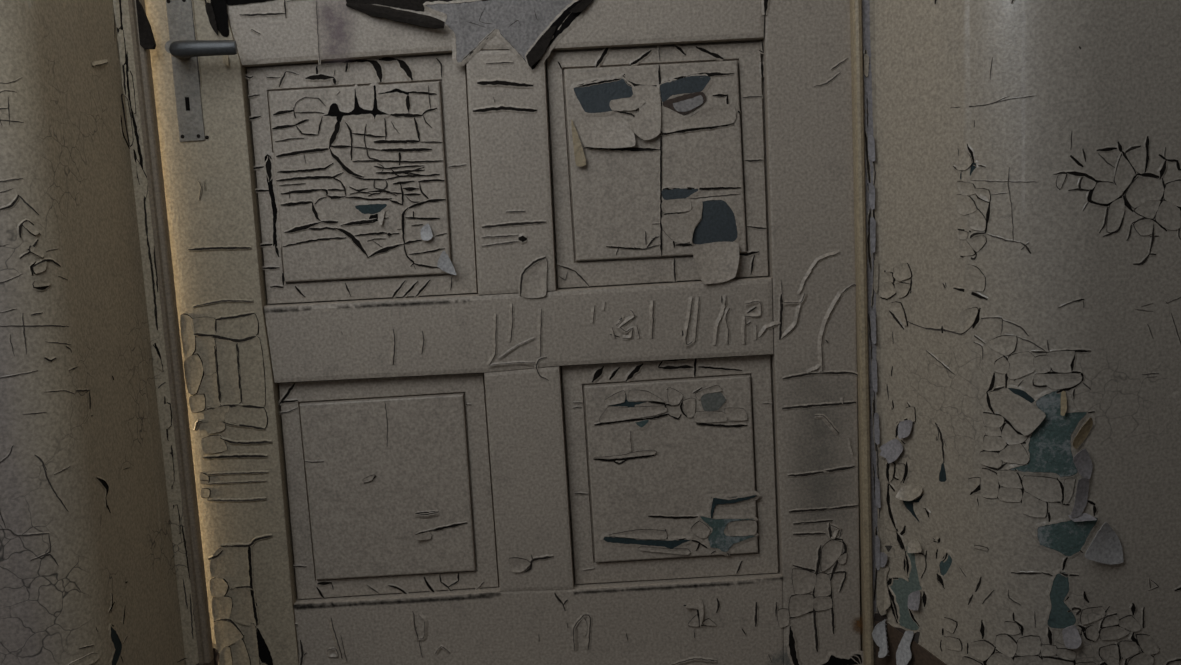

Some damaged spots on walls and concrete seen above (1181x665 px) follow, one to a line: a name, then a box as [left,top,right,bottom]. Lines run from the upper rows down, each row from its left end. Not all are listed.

crack [0,77,24,126]
peeling [423,0,599,74]
crack [0,177,39,215]
peeling [570,65,741,284]
peeling [1053,131,1181,267]
crack [0,273,93,417]
peeling [180,311,268,434]
peeling [923,144,1159,665]
crack [0,445,70,566]
peeling [600,491,761,556]
peeling [872,366,967,665]
peeling [208,534,278,665]